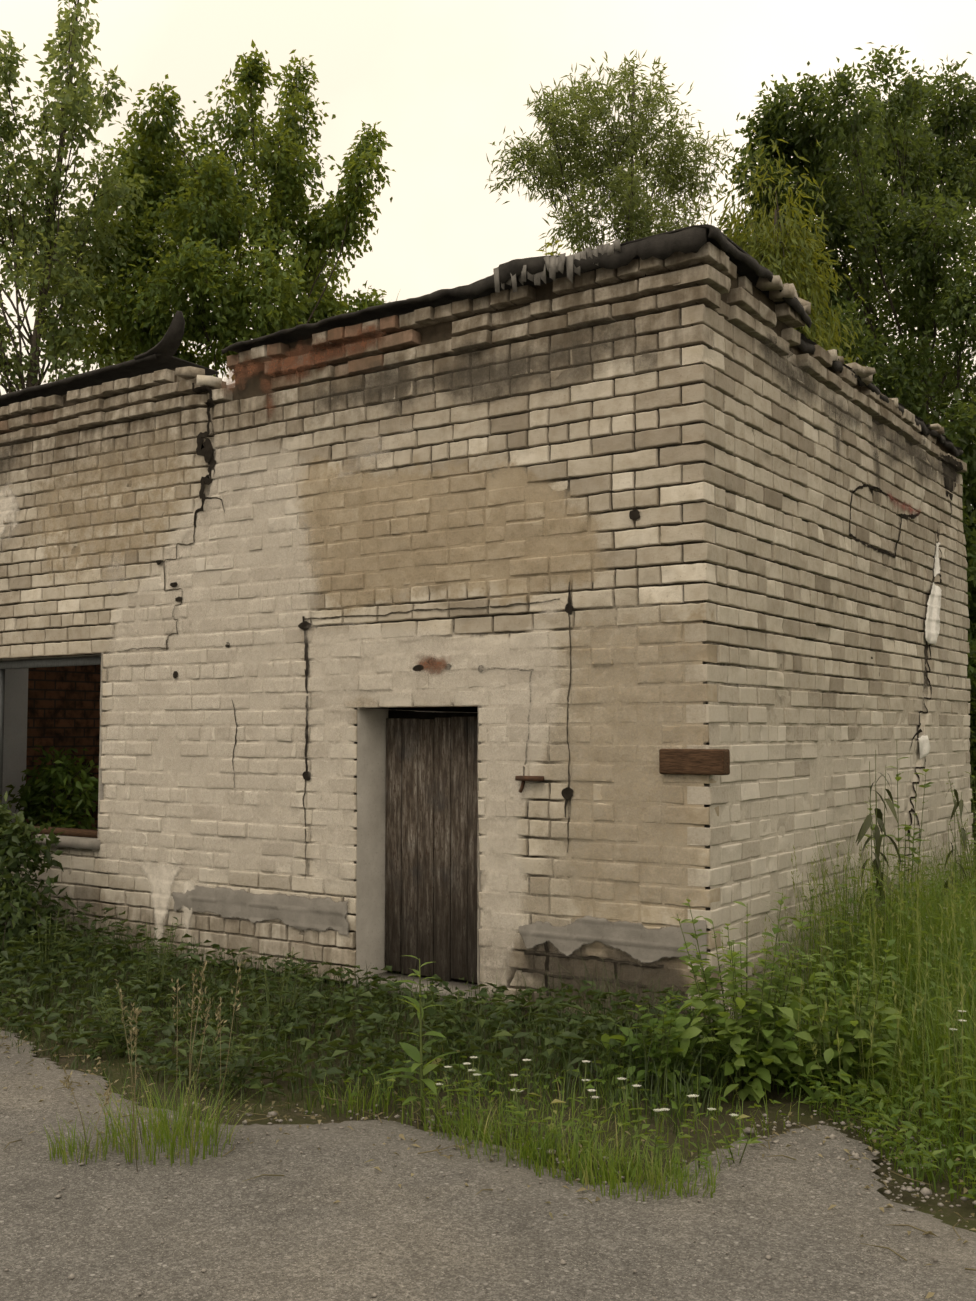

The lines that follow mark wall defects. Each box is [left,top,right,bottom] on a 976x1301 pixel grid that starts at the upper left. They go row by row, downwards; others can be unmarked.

leakage [0,486,18,540]
crack [125,383,225,678]
peeling [518,915,707,1024]